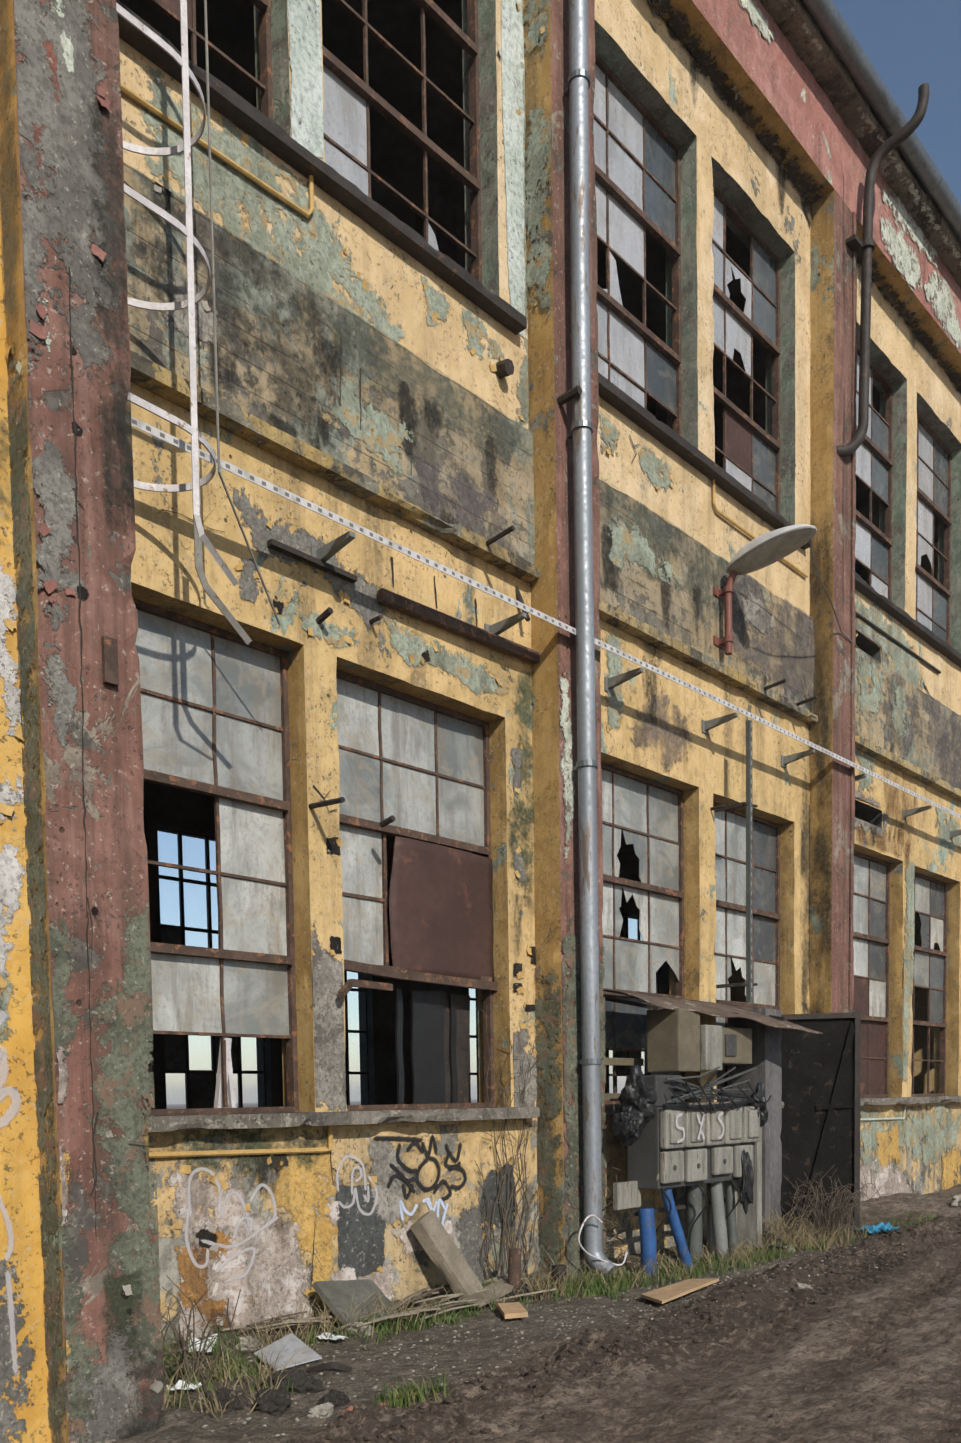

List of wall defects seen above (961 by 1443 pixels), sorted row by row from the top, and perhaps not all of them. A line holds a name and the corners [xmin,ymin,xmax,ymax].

peeling [739,0,778,44]
spalling [154,172,174,197]
spalling [161,269,221,348]
damp [92,107,521,555]
peeling [858,106,961,349]
peeling [232,486,510,700]
peeling [0,0,118,1443]
damp [602,491,833,1014]
damp [880,673,961,790]
spalling [167,1140,428,1340]
damp [70,1272,165,1443]
peeling [150,1379,163,1393]